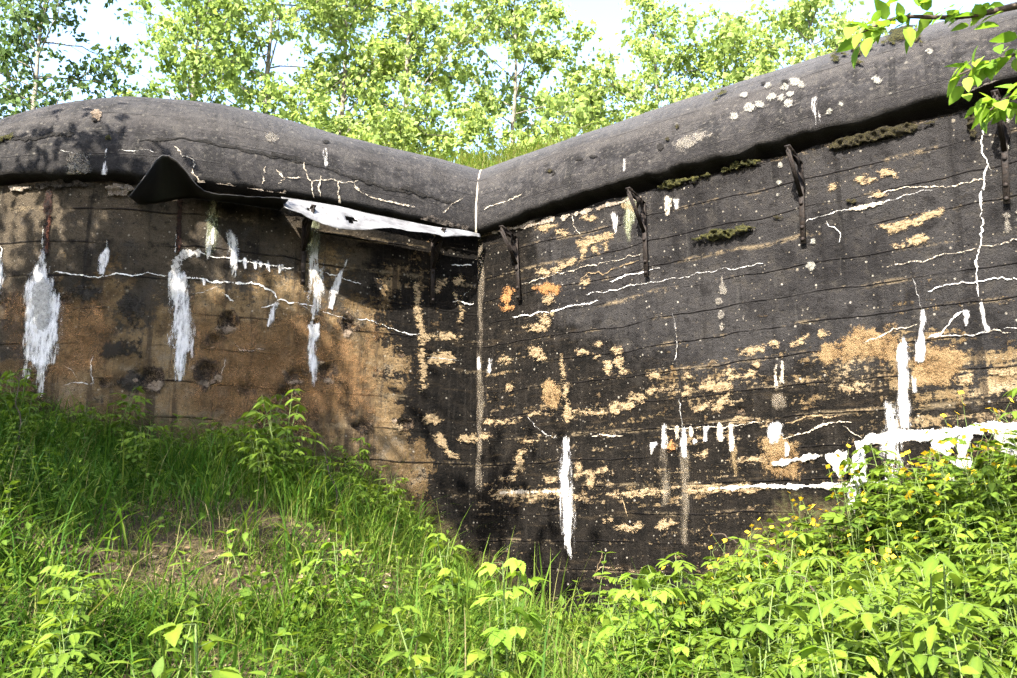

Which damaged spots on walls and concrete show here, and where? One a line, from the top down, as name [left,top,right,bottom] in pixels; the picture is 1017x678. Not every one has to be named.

crack [124,137,459,213]
leakage [23,253,106,393]
efflorescence [168,200,239,380]
crack [55,252,416,374]
peeling [413,275,466,392]
spalling [485,196,642,332]
peeling [488,440,670,503]
crack [514,254,763,318]
peeling [560,329,831,423]
leakage [650,421,758,468]
leakage [708,310,1017,513]
crack [810,130,1016,343]